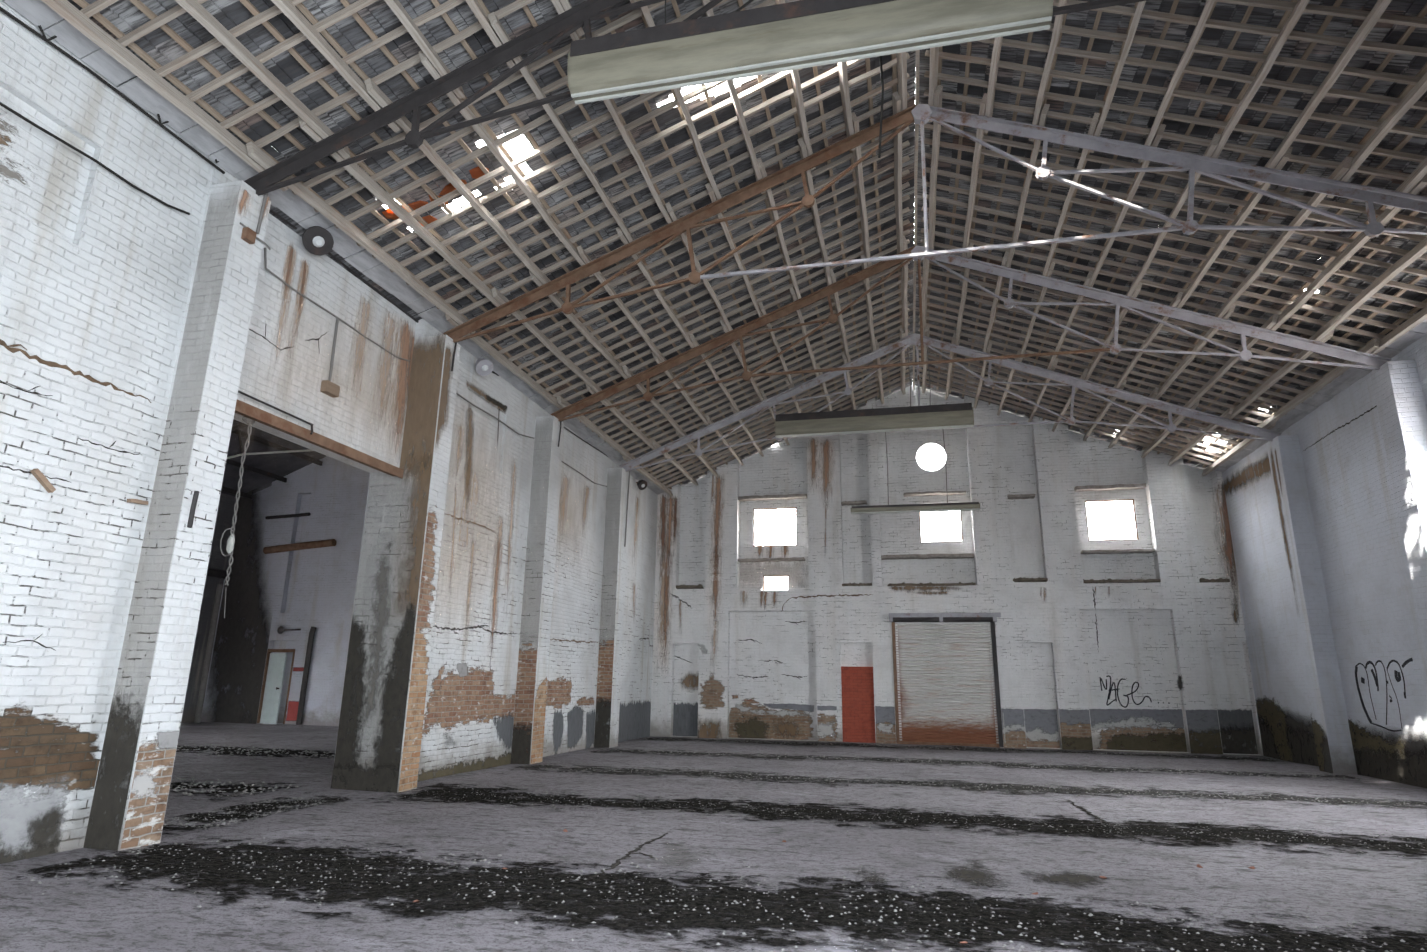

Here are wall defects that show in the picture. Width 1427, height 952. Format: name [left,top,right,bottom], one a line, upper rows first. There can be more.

corrosion [286,249,306,321]
crack [0,339,151,403]
corrosion [396,325,414,435]
flaking render [435,347,451,447]
corrosion [661,496,677,656]
crack [3,634,56,651]
spalling [331,505,516,793]
flaking render [0,705,100,792]
flaking render [120,731,179,851]
flaking render [531,676,594,764]
flaking render [698,675,838,742]
leakage [1355,731,1427,756]